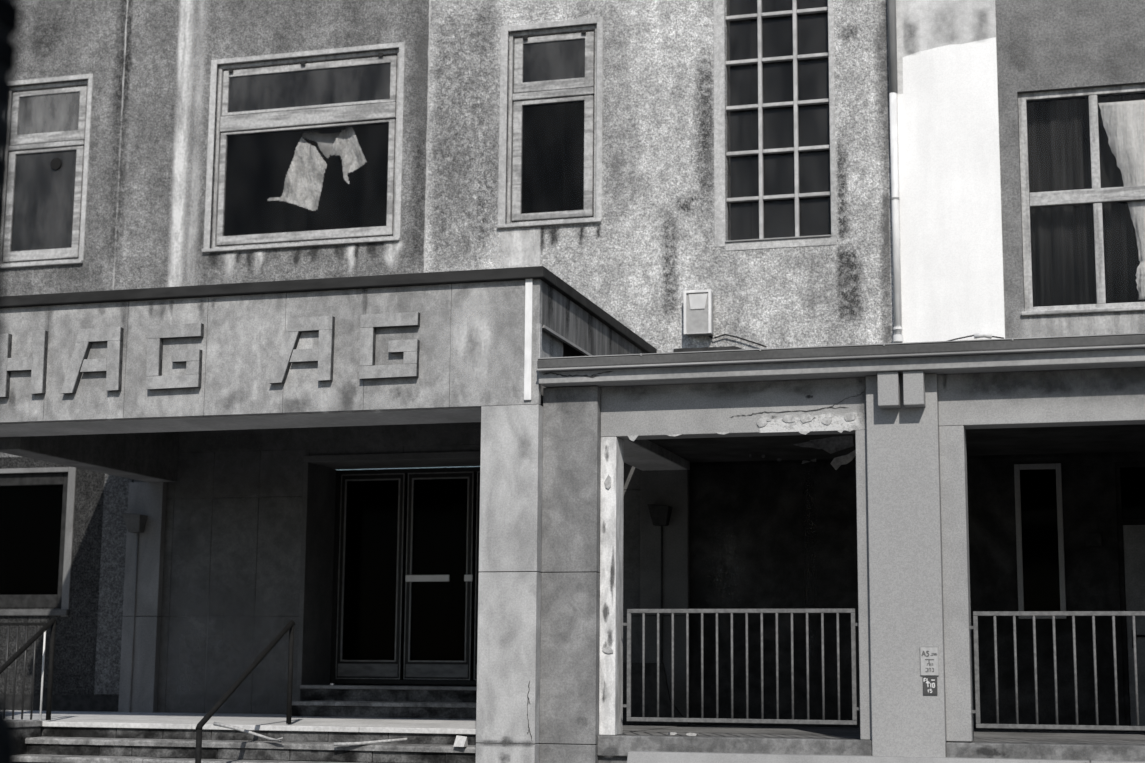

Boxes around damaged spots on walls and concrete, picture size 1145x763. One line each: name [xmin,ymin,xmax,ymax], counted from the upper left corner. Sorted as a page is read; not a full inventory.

leakage [678,62,712,212]
leakage [663,221,677,310]
crack [732,388,866,417]
flaking render [757,412,864,470]
crack [525,681,533,740]